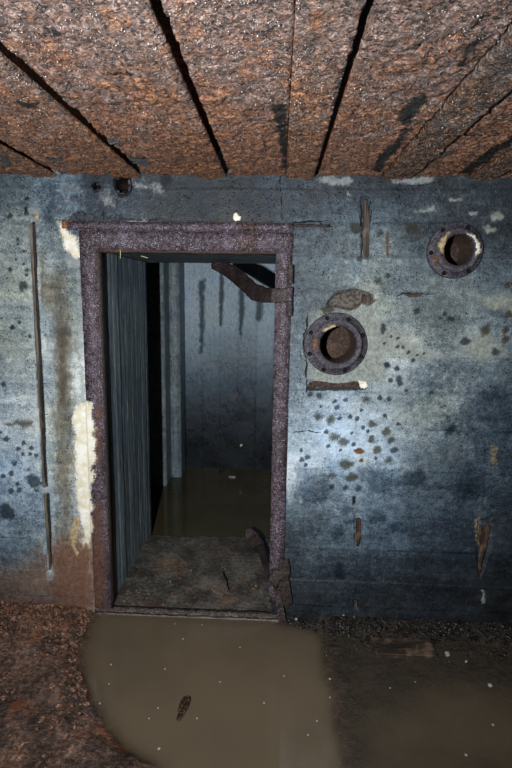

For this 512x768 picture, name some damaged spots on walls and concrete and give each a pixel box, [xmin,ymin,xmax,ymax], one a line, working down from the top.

spalling [57,207,168,259]
water stain [482,294,512,311]
corrosion [308,380,368,391]
water stain [380,323,430,392]
water stain [460,335,504,361]
peeling [71,399,98,558]
water stain [294,392,426,505]
water stain [446,388,512,502]